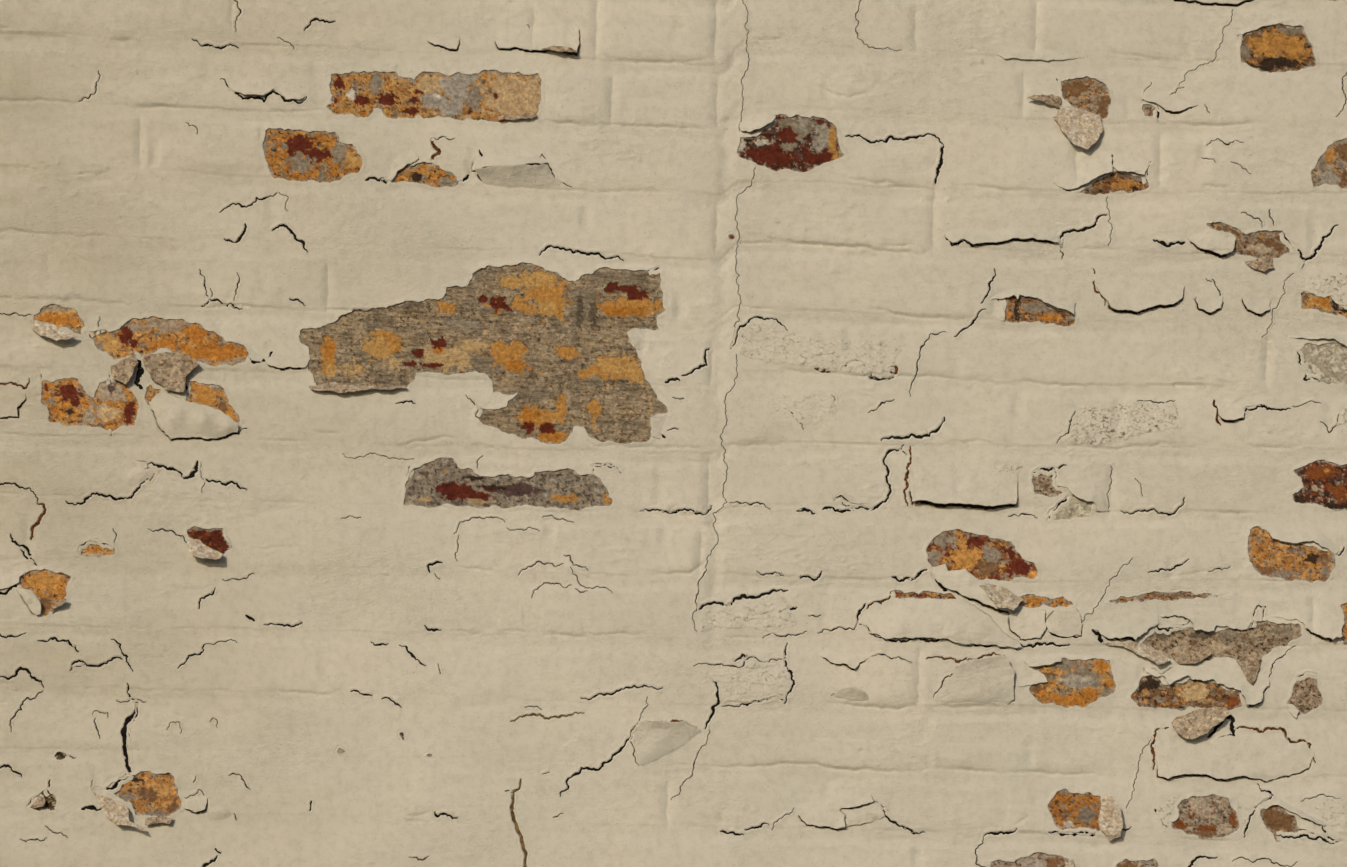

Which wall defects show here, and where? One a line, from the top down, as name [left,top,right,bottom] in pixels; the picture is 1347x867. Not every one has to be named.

crack [737,0,752,131]
peeling [1236,20,1320,77]
peeling [259,66,573,192]
peeling [733,110,947,184]
peeling [0,258,679,515]
crack [639,166,757,633]
crack [0,479,49,542]
peeling [1286,456,1347,515]
crack [176,571,306,671]
crack [0,629,221,778]
peeling [629,522,1347,867]
crack [718,826,745,839]